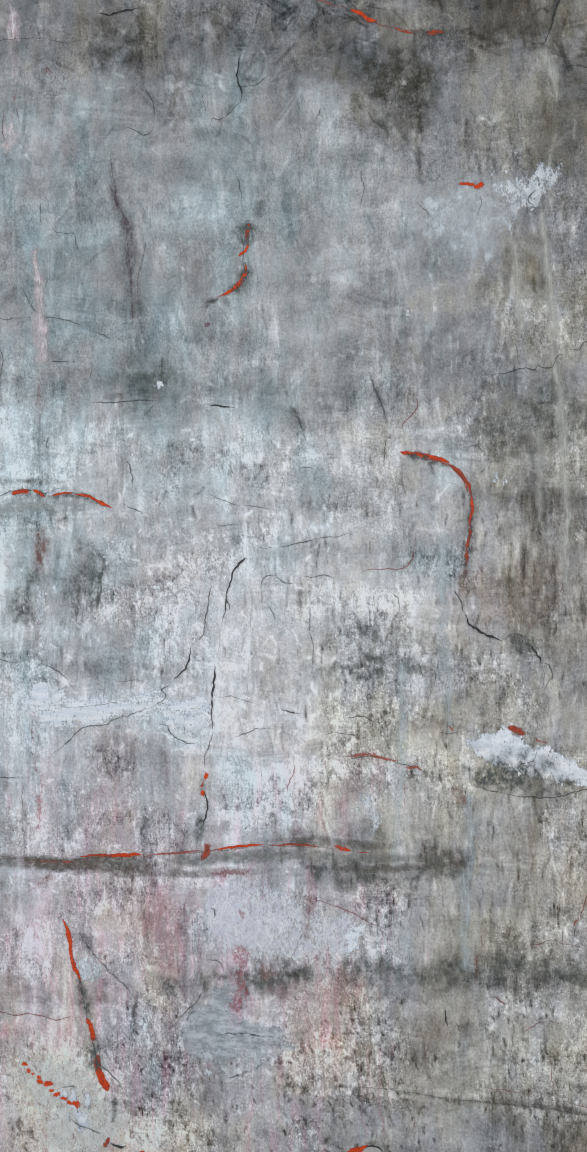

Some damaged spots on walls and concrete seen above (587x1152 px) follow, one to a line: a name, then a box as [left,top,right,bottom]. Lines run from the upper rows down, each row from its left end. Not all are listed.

crack [317,0,444,36]
crack [208,223,256,303]
crack [0,462,140,512]
crack [373,384,553,687]
crack [365,538,416,608]
crack [0,533,405,875]
flaking render [464,725,587,792]
crack [0,919,135,1149]
crack [347,1144,382,1152]